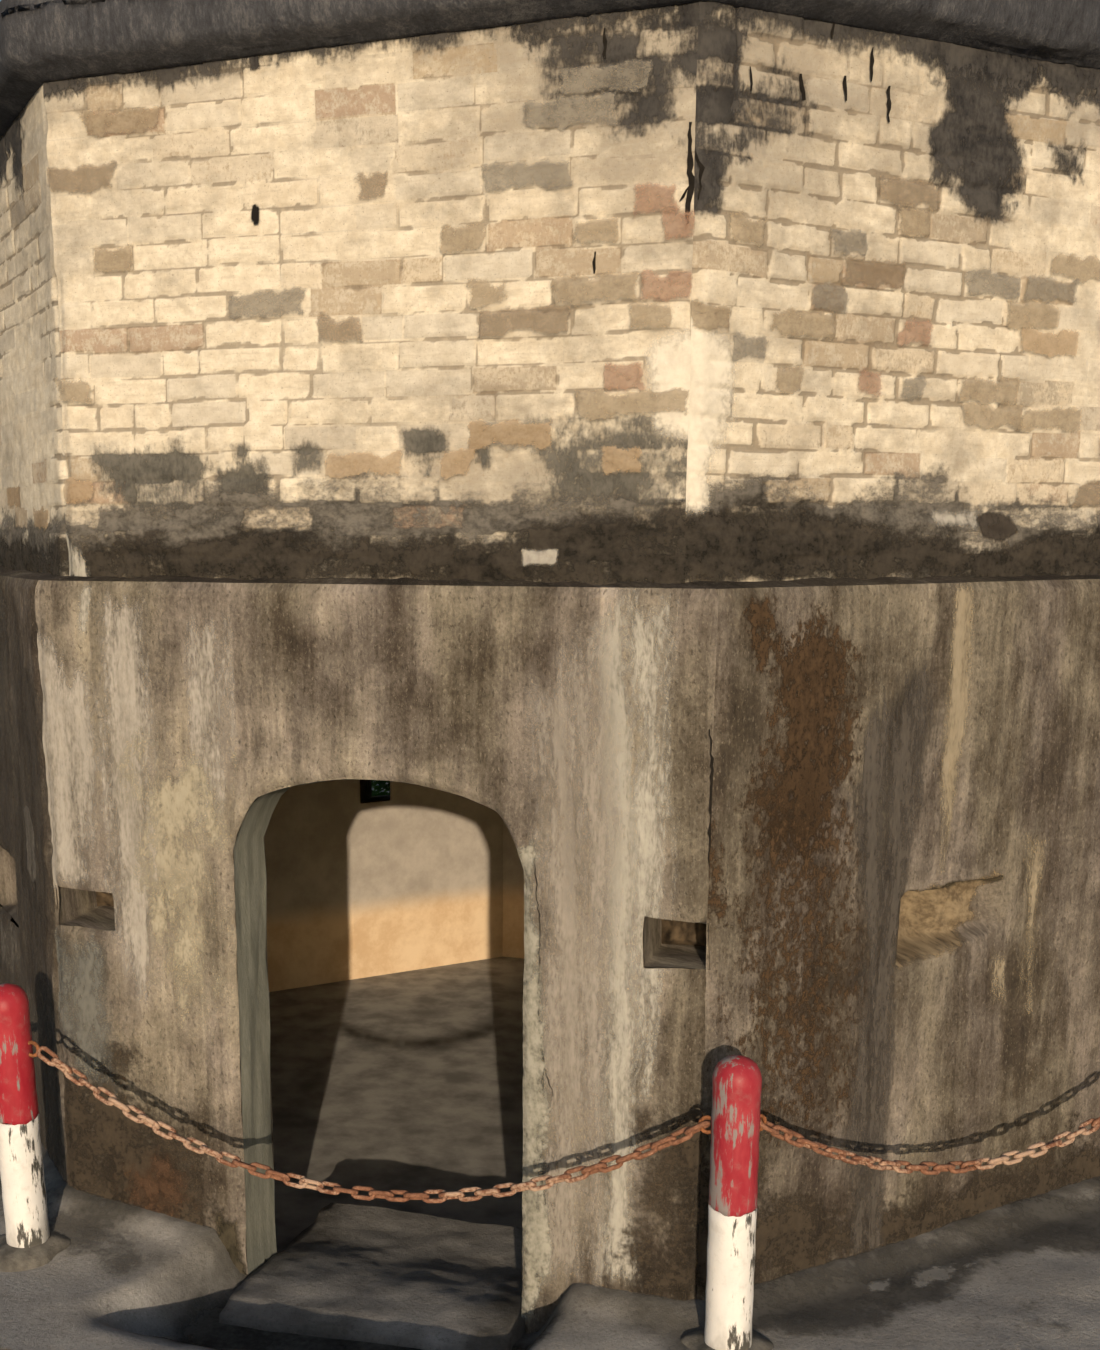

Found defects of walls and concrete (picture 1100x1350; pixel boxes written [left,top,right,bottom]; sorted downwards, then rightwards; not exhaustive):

damp [43,1,1100,223]
crack [798,74,806,100]
crack [843,47,891,122]
crack [679,122,705,213]
damp [92,440,271,515]
damp [293,443,321,471]
damp [403,429,448,476]
damp [474,447,491,468]
damp [707,587,1100,1336]